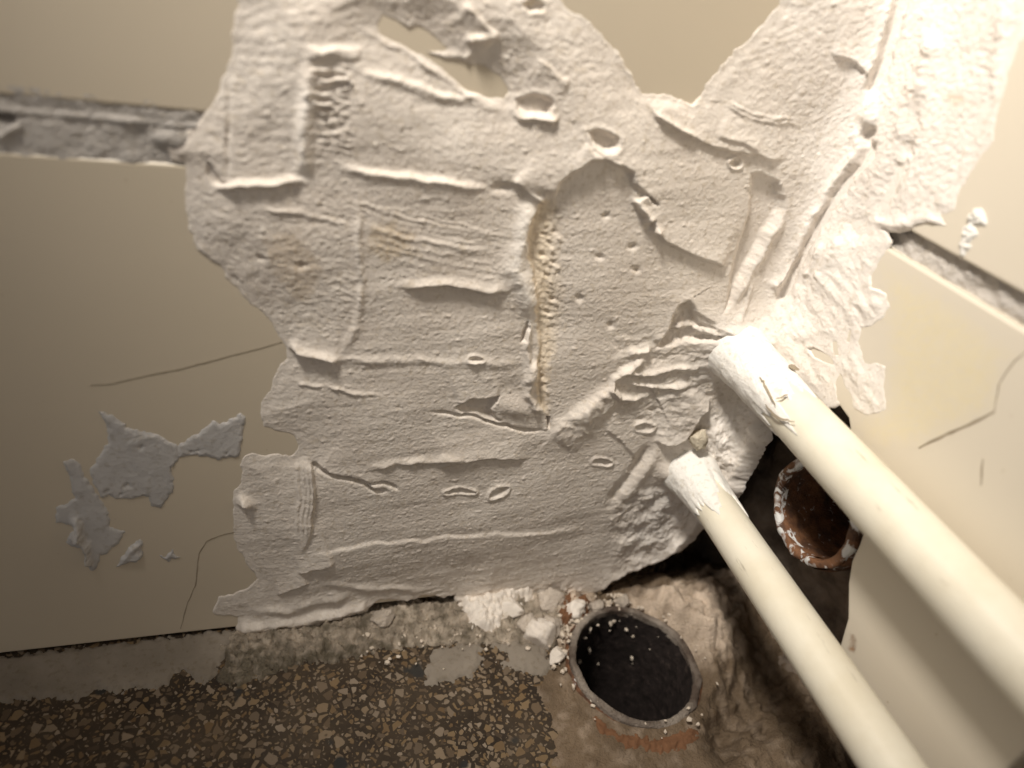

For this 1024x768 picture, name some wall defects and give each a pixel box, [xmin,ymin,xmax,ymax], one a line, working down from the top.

crack [90,342,281,386]
crack [918,353,1024,449]
peeling [178,413,246,460]
crack [310,460,400,494]
crack [180,532,234,629]